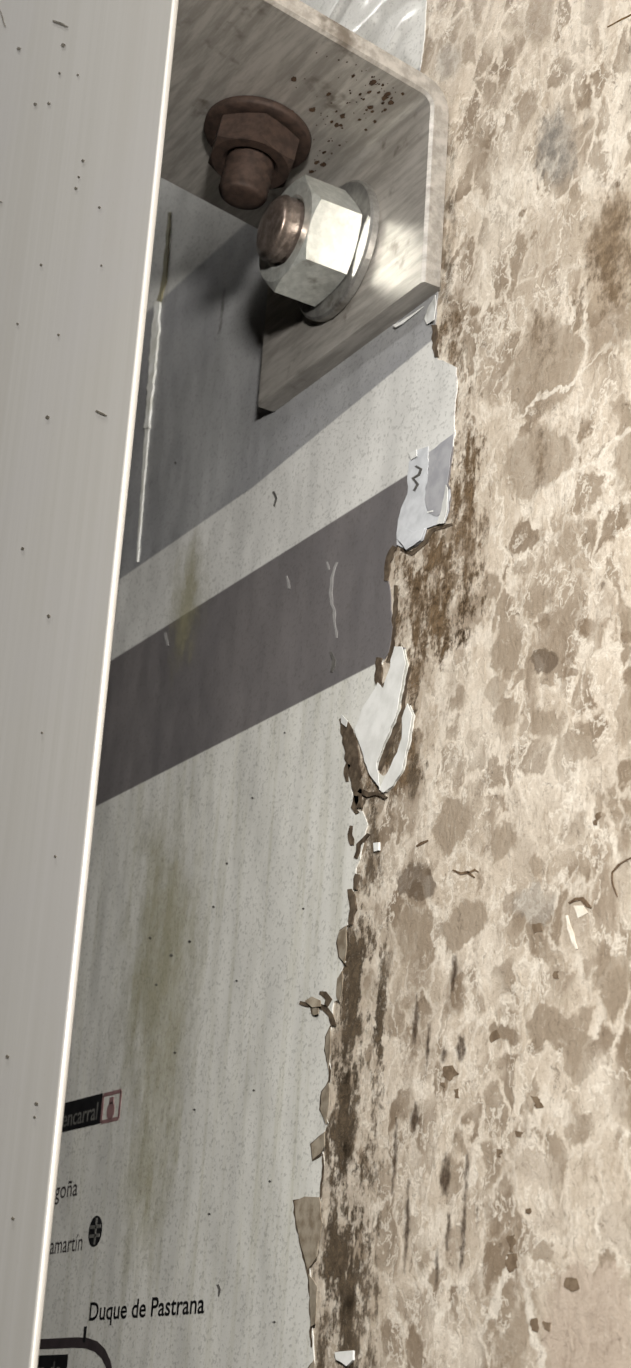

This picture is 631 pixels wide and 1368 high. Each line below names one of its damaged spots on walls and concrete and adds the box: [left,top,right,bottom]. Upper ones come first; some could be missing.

peeling [341,434,454,793]
peeling [293,924,351,1368]